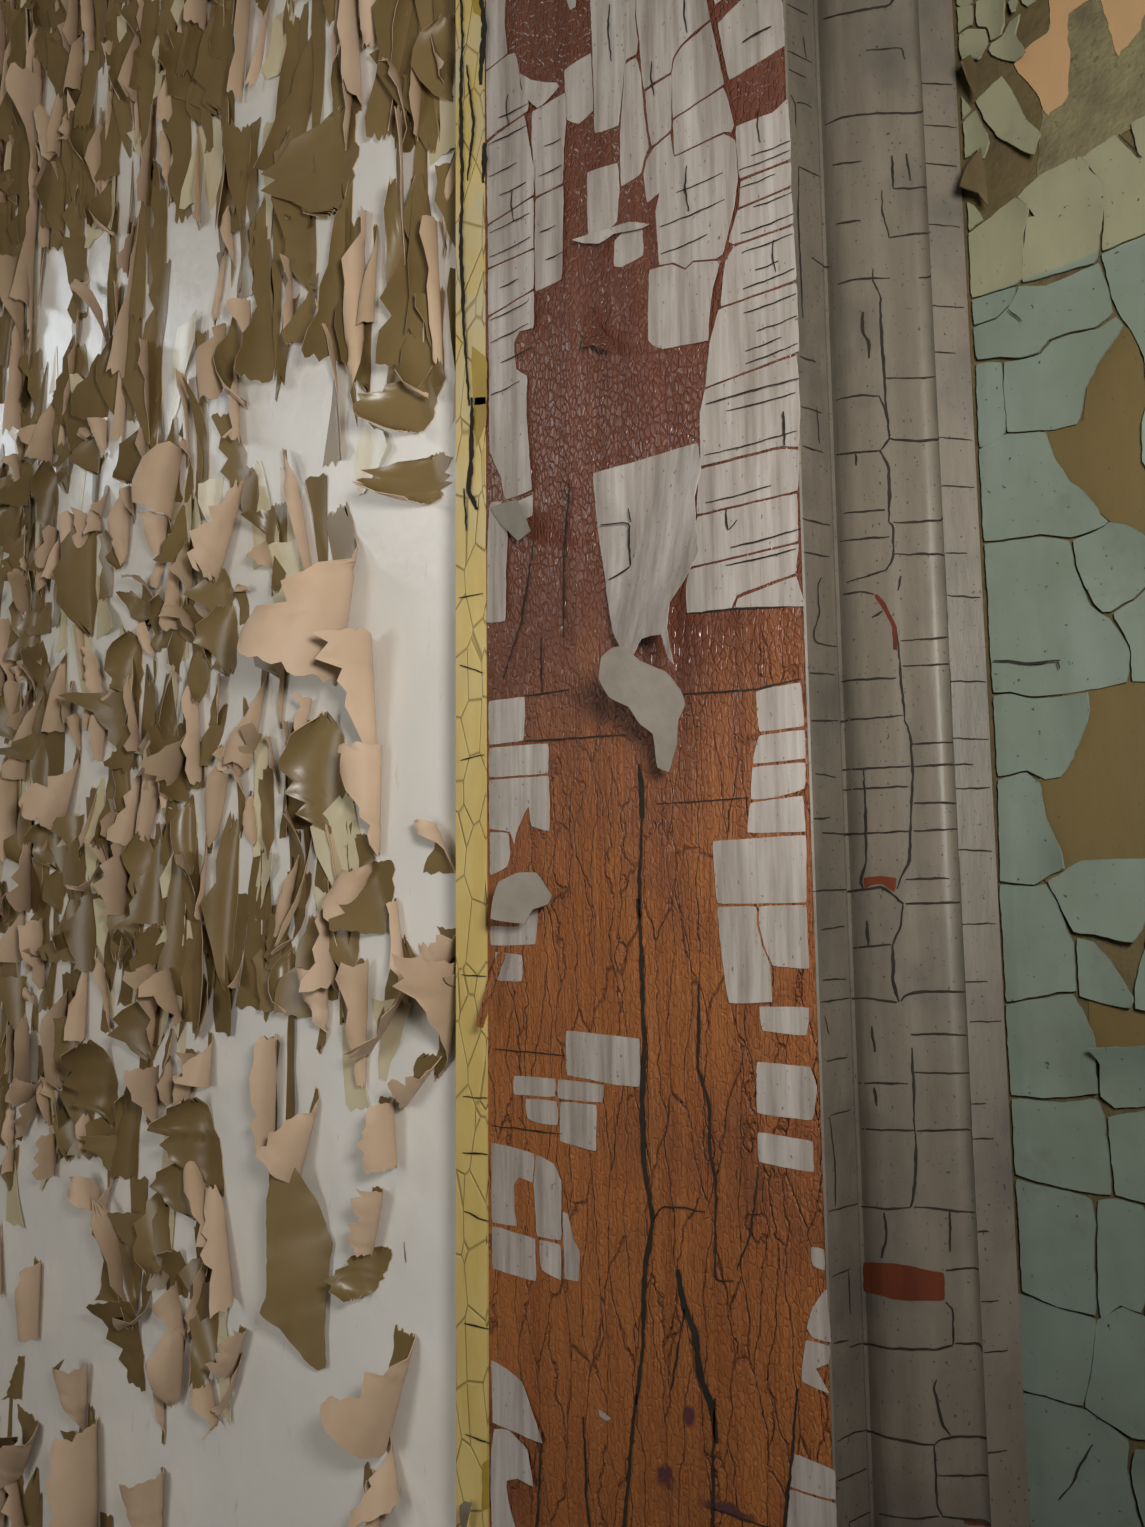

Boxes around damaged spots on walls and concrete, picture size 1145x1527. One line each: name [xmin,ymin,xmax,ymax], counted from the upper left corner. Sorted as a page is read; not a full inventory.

crack [605,4,613,61]
crack [459,0,562,531]
crack [460,483,632,696]
peeling [0,0,817,1445]
crack [660,0,1060,1527]
peeling [957,0,1145,1527]
crack [463,1096,562,1155]
crack [524,734,799,1527]
peeling [0,1475,41,1527]
peeling [459,1360,542,1527]
peeling [787,1454,837,1527]
peeling [802,1289,831,1394]